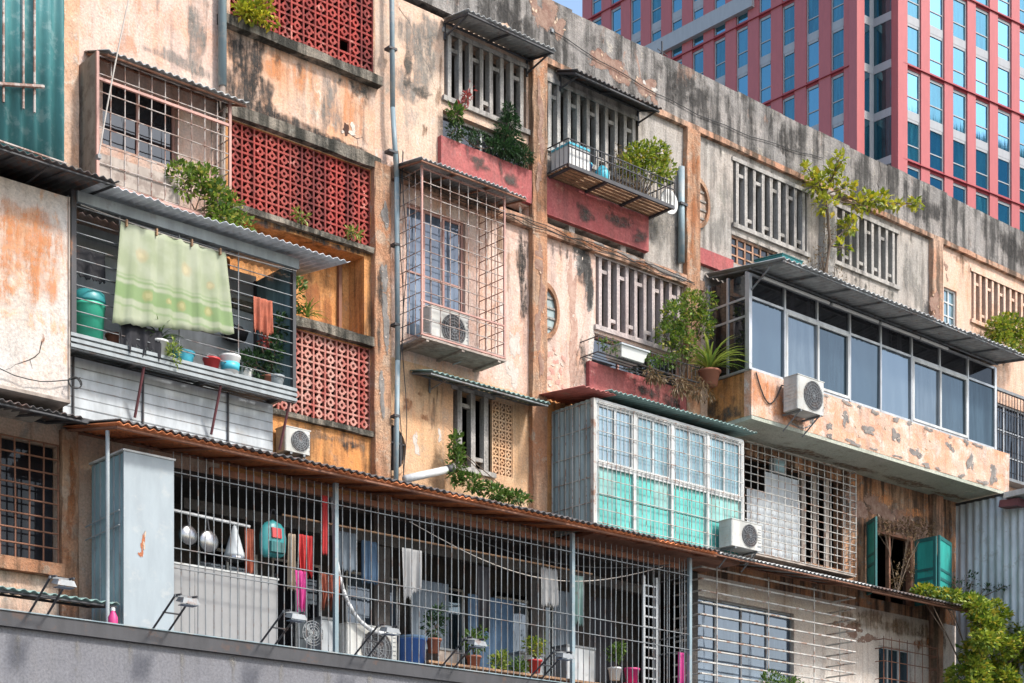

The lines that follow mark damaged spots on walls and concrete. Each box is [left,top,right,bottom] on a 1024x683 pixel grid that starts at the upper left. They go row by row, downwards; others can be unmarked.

leakage [145,4,210,76]
leakage [225,34,369,151]
leakage [643,65,712,119]
leakage [769,116,818,159]
leakage [904,182,946,222]
leakage [982,220,1024,266]
peeling [827,399,942,471]
peeling [945,435,998,486]